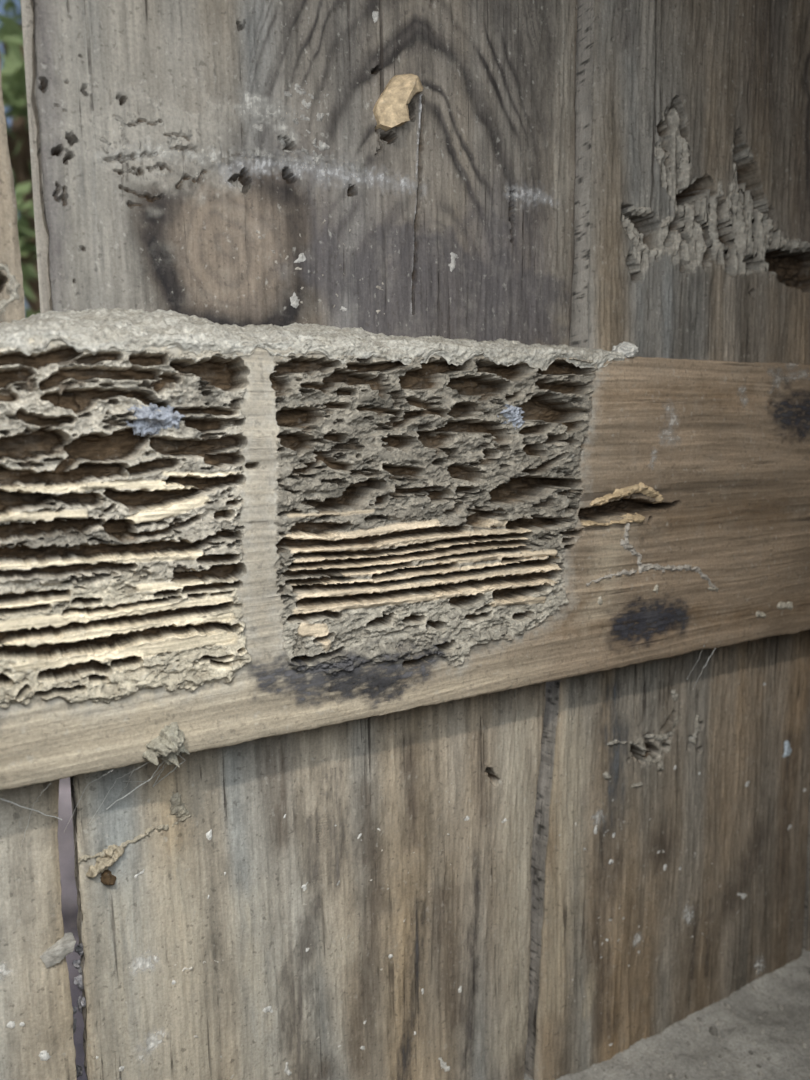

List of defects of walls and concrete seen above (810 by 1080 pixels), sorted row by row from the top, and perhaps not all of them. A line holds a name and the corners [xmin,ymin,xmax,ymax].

spalling [621,95,810,293]
water stain [771,363,810,438]
spalling [0,345,261,701]
spalling [270,356,681,668]
water stain [611,597,689,645]
spalling [606,689,679,770]